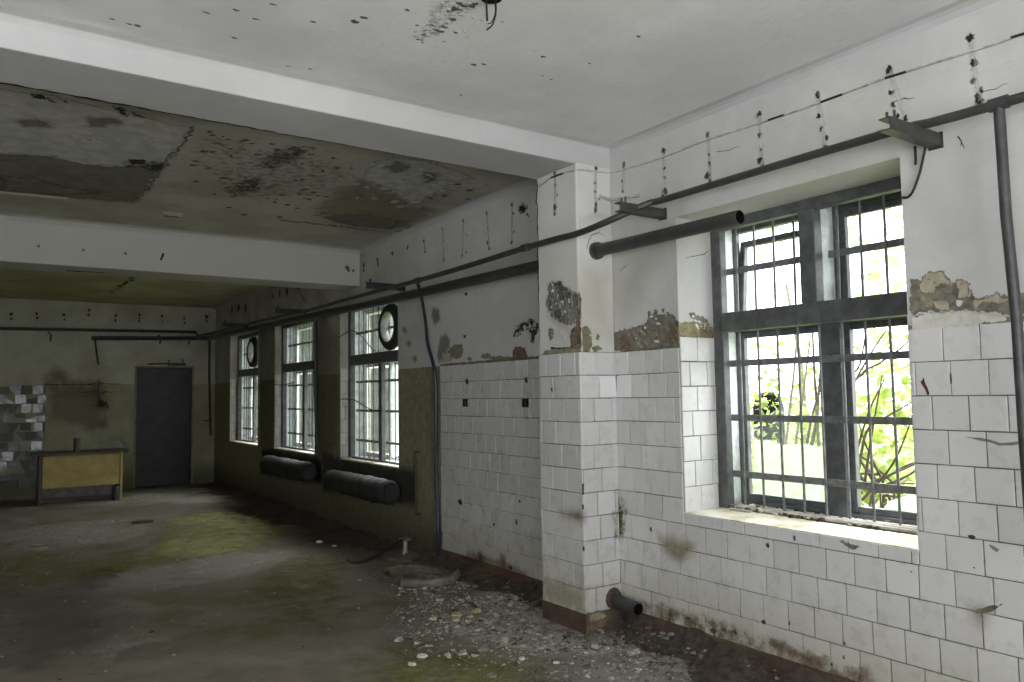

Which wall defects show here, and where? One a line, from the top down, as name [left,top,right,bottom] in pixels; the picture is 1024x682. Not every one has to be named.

damp [227,146,324,197]
crack [0,82,540,332]
flaking render [441,281,714,362]
flaking render [909,271,1024,331]
damp [613,498,627,537]